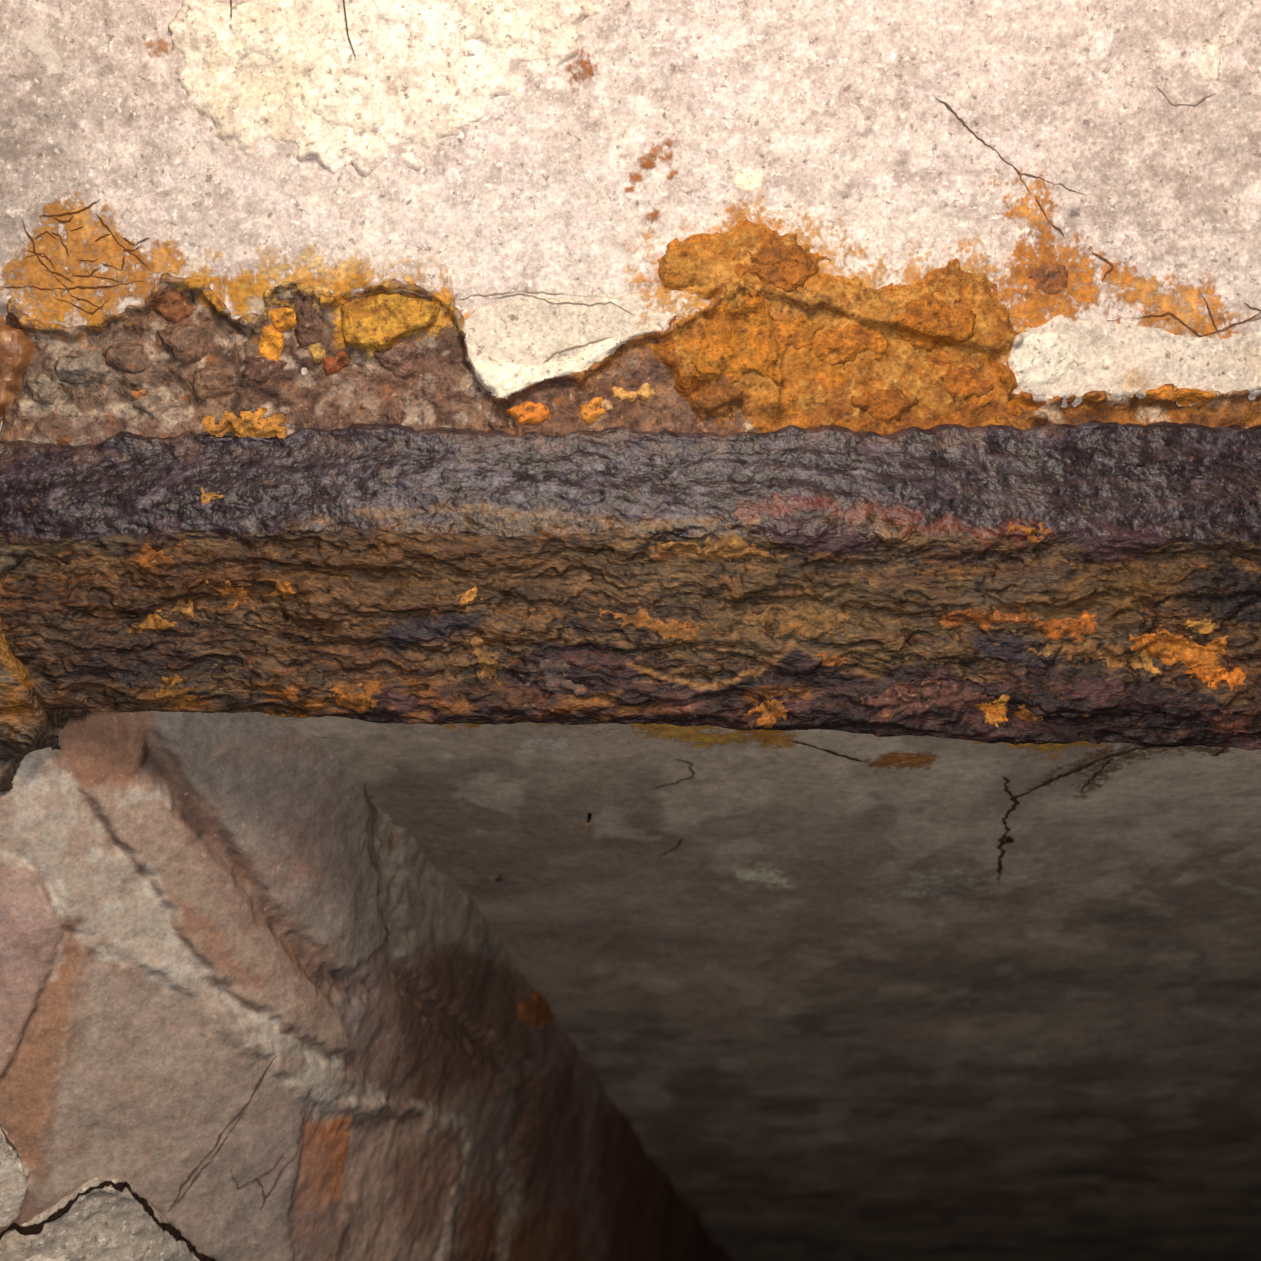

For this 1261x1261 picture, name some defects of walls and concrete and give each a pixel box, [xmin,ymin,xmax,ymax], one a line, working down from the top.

spalling [168,0,605,177]
rust [625,140,677,192]
rust [0,191,469,358]
rust [990,174,1261,339]
rust [202,408,287,438]
spalling [0,273,760,446]
flaking render [1008,315,1261,400]
rust [200,487,223,505]
rust [0,522,1261,757]
rust [864,752,937,769]
crack [996,745,1236,885]